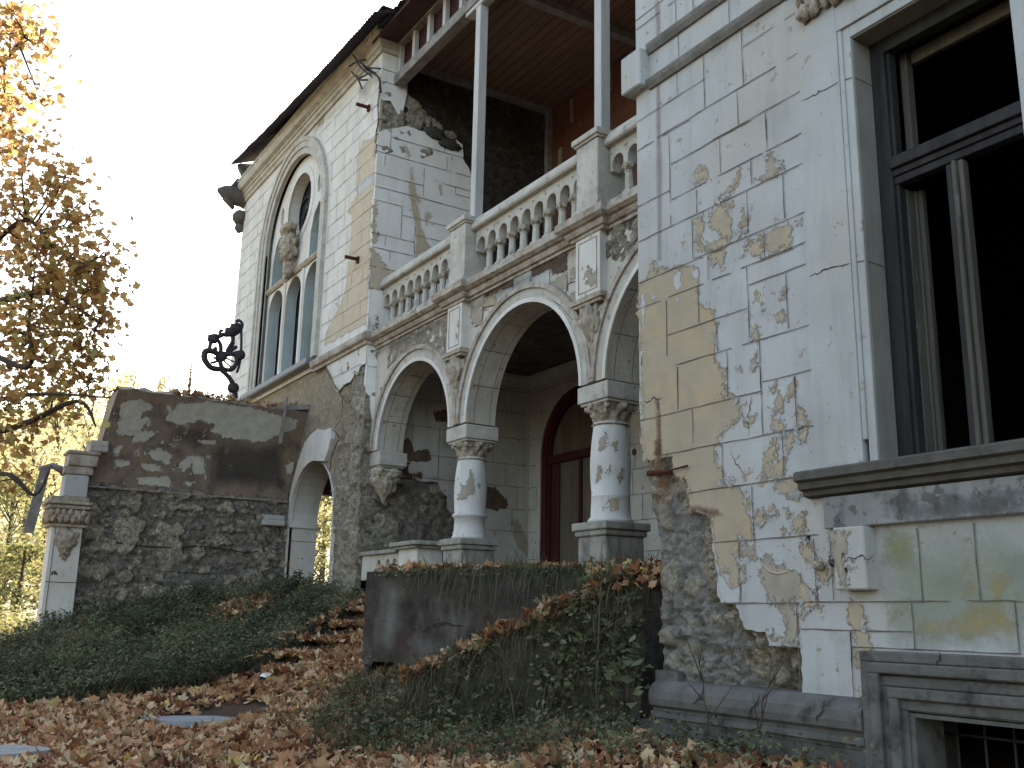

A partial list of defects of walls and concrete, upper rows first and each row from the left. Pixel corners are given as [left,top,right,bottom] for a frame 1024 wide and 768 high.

spalling [324,73,545,346]
peeling [107,398,298,488]
water stain [217,449,280,482]
peeling [456,470,508,511]
peeling [598,430,619,451]
peeling [595,465,624,511]
peeling [636,150,876,690]
water stain [887,488,1017,517]